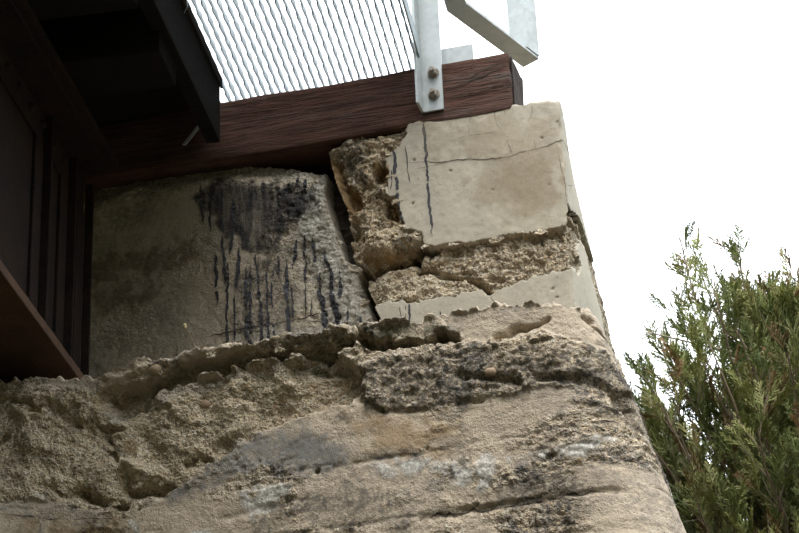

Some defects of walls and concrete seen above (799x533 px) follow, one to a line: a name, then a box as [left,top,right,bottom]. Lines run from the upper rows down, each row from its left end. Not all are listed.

water stain [199,174,371,349]
water stain [331,142,392,217]
water stain [389,203,400,223]
crack [409,110,577,224]
spalling [0,136,579,512]
crack [420,490,614,533]